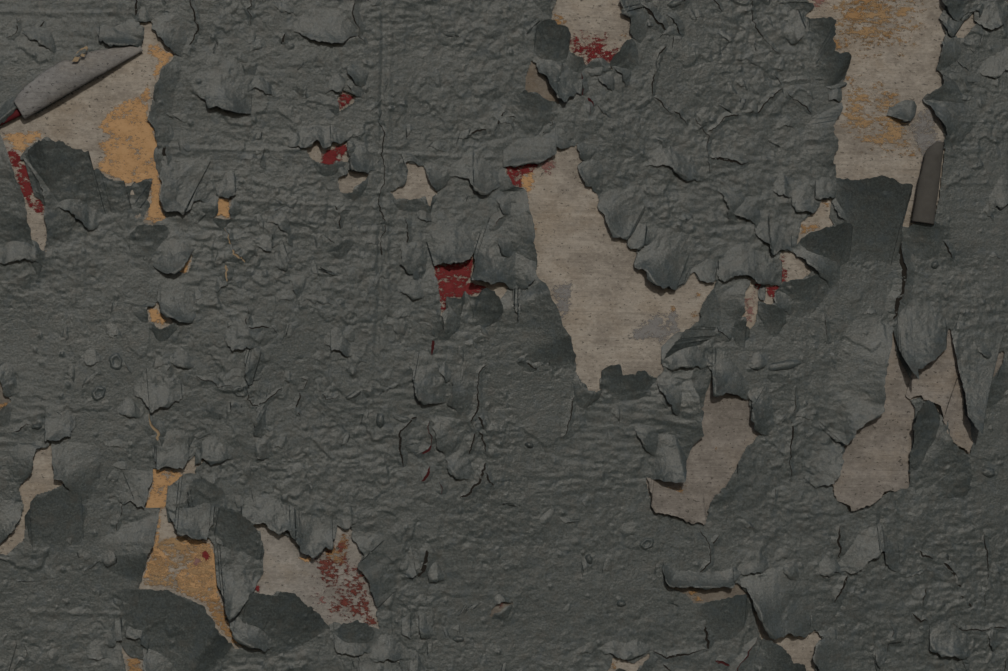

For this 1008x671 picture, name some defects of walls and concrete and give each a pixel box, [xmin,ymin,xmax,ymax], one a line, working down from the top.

peeling [0,7,253,342]
crack [886,226,915,323]
peeling [0,362,19,427]
peeling [117,366,188,418]
peeling [225,310,265,385]
peeling [0,405,105,555]
peeling [662,550,850,671]